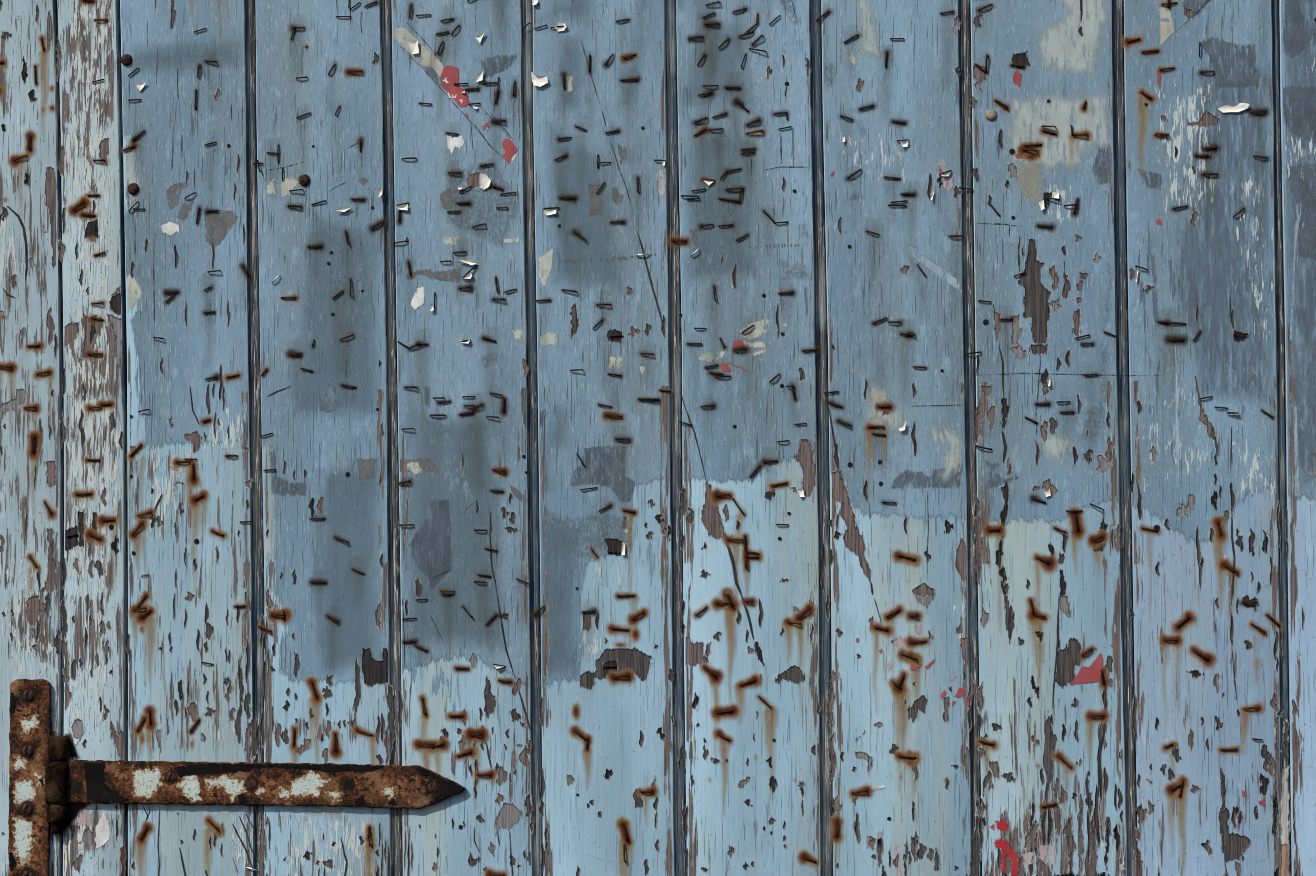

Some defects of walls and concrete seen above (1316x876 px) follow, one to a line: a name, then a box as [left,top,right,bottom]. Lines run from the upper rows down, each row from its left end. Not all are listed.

peeling [446,135,489,190]
peeling [411,287,424,310]
peeling [736,0,1316,876]
peeling [432,272,741,876]
corrosion [710,488,762,576]
corrosion [607,593,648,647]
corrosion [1159,611,1216,667]
corrosion [329,695,496,798]
corrosion [700,663,776,782]
corrosion [871,605,929,773]
peeling [50,803,137,876]
peeling [180,806,421,876]